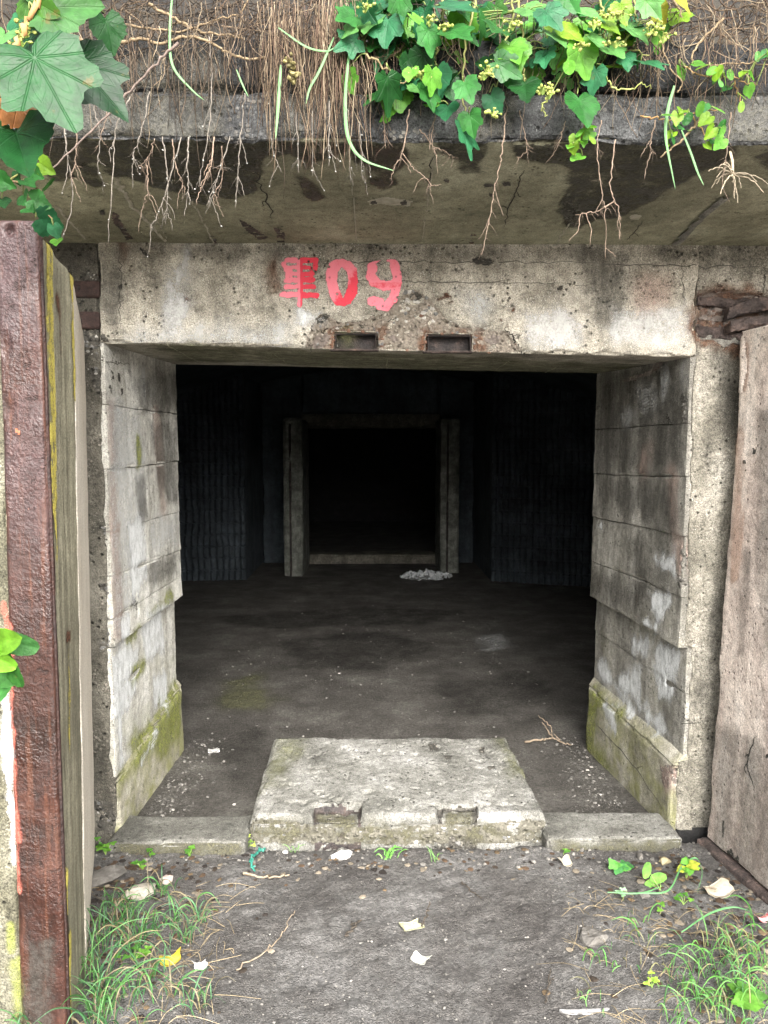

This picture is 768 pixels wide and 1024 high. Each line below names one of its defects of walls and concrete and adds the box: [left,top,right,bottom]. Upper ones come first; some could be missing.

leakage [43,54,408,205]
crack [256,176,274,219]
leakage [438,80,515,173]
crack [502,172,524,226]
leakage [512,95,768,229]
spalling [692,282,768,328]
leakage [128,515,147,597]
efflorescence [655,556,676,574]
leakage [112,603,170,765]
efflorescence [598,659,665,734]
efflorescence [632,593,680,699]
crack [744,737,755,787]